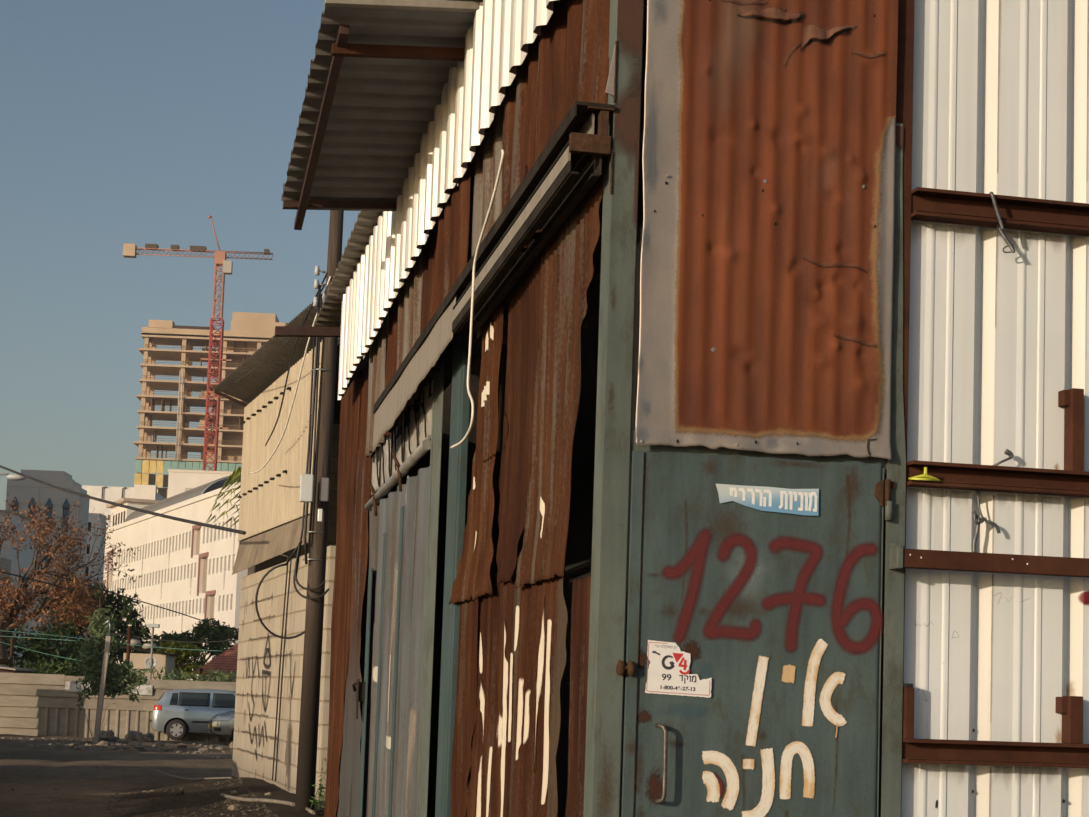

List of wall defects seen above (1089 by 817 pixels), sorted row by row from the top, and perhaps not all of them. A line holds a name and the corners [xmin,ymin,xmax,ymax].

corrosion [675,0,904,442]